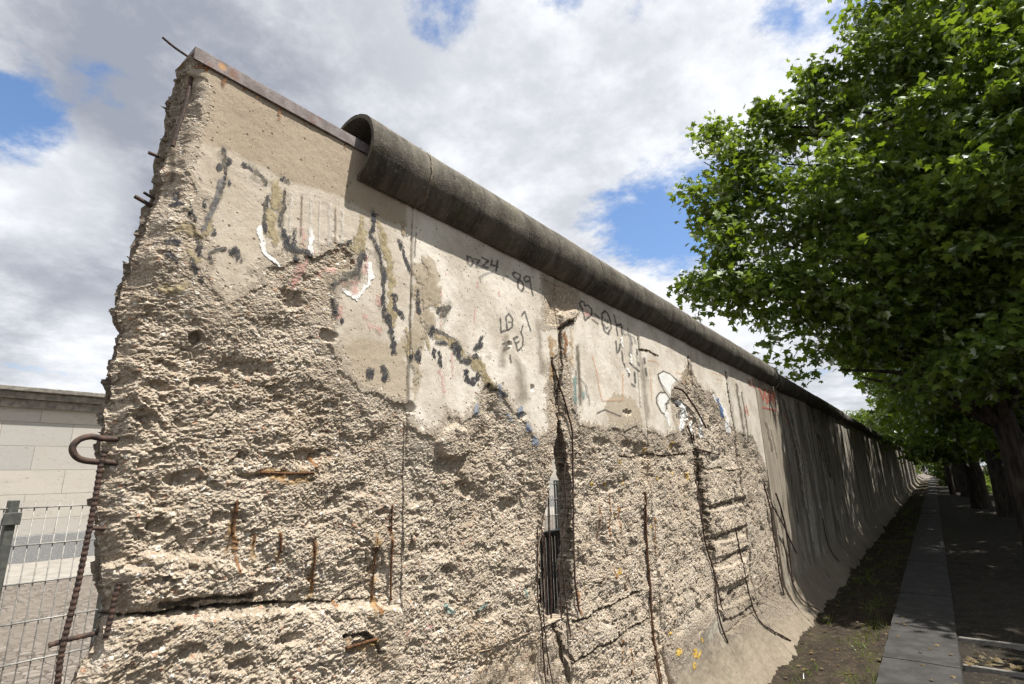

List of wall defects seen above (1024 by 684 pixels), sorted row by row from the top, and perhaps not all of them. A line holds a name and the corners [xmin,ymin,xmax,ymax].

spalling [48,37,826,684]
crack [550,313,578,409]
corrosion [257,455,318,483]
corrosion [229,522,242,574]
crack [98,423,405,657]
crack [550,589,649,684]